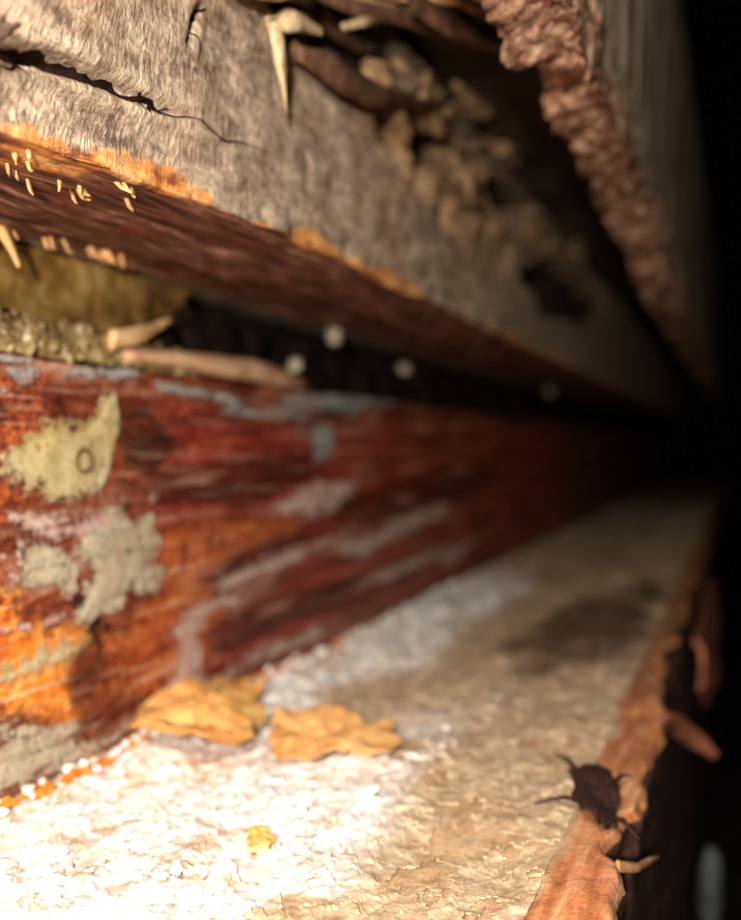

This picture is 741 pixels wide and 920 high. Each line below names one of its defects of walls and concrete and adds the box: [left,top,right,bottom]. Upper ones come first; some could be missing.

crack [186,8,206,59]
crack [0,49,268,153]
peeling [0,304,400,690]
corrosion [0,366,565,752]
corrosion [268,705,402,761]